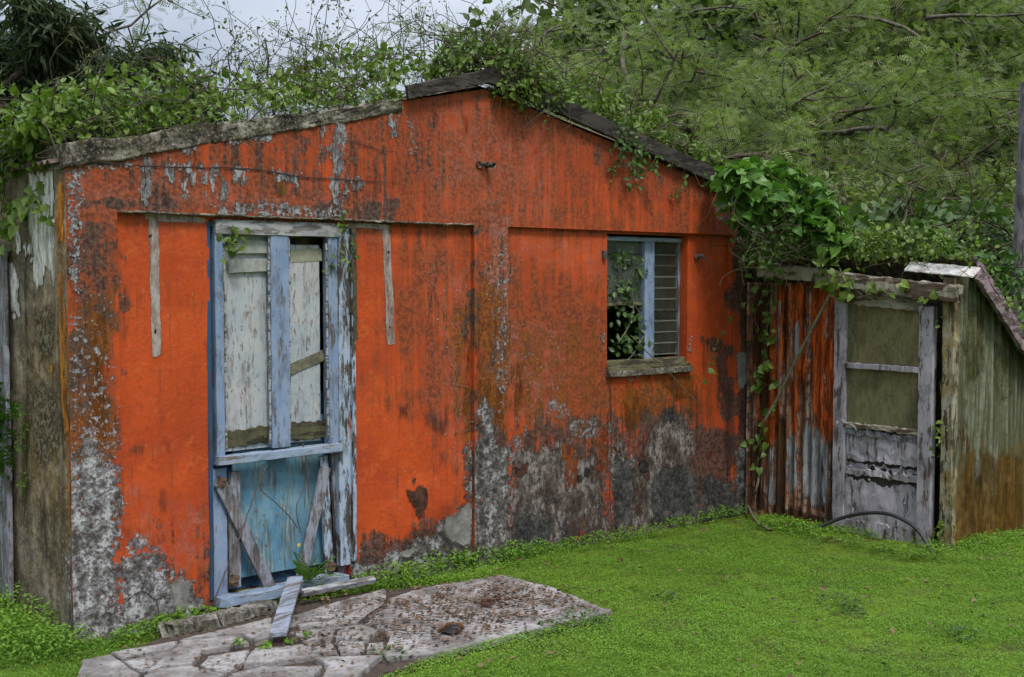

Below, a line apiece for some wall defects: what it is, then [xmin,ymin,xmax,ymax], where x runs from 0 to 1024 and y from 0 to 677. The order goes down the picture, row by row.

leakage [49,180,71,534]
peeling [7,119,365,649]
leakage [511,435,529,477]
leakage [548,398,615,520]
rust [751,283,837,525]